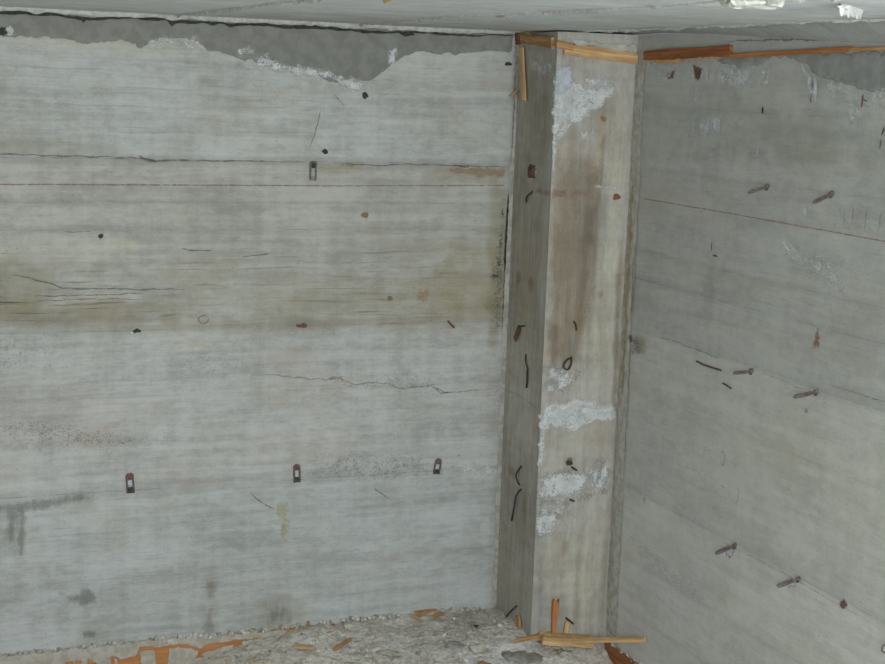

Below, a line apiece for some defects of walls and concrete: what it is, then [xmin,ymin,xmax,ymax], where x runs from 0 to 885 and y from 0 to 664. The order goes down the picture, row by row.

spalling [0,26,14,36]
peeling [237,46,369,99]
spalling [544,366,581,394]
spalling [536,454,611,537]